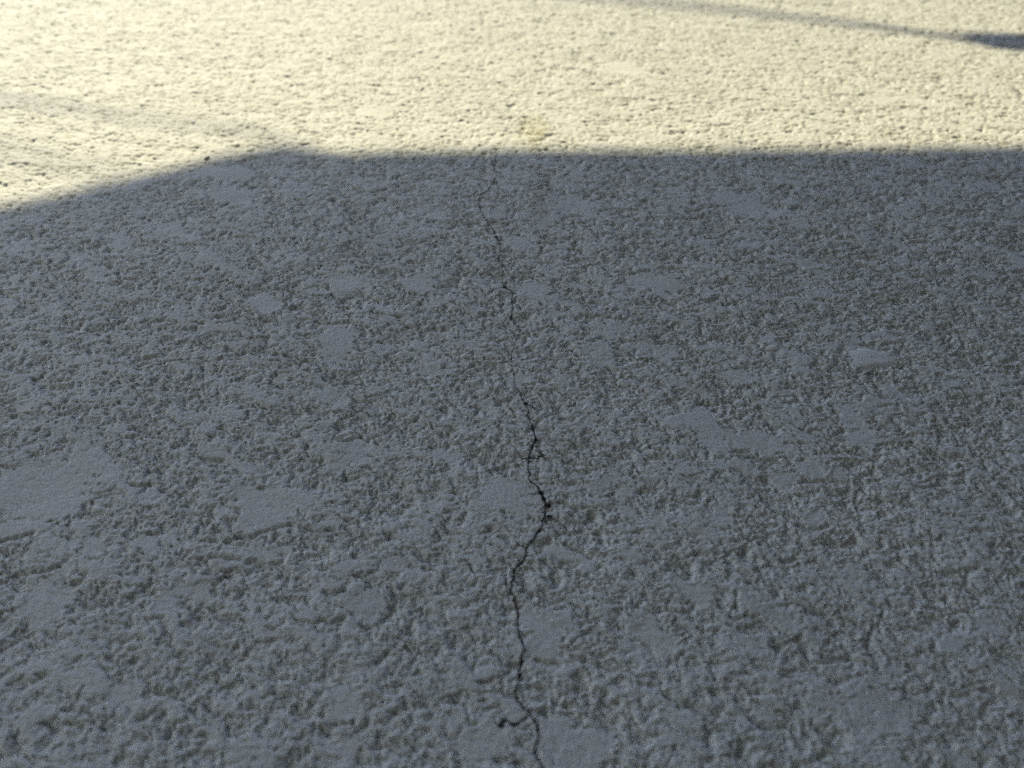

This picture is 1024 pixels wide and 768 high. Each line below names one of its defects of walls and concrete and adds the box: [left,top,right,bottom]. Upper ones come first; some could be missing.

crack [478,147,555,768]